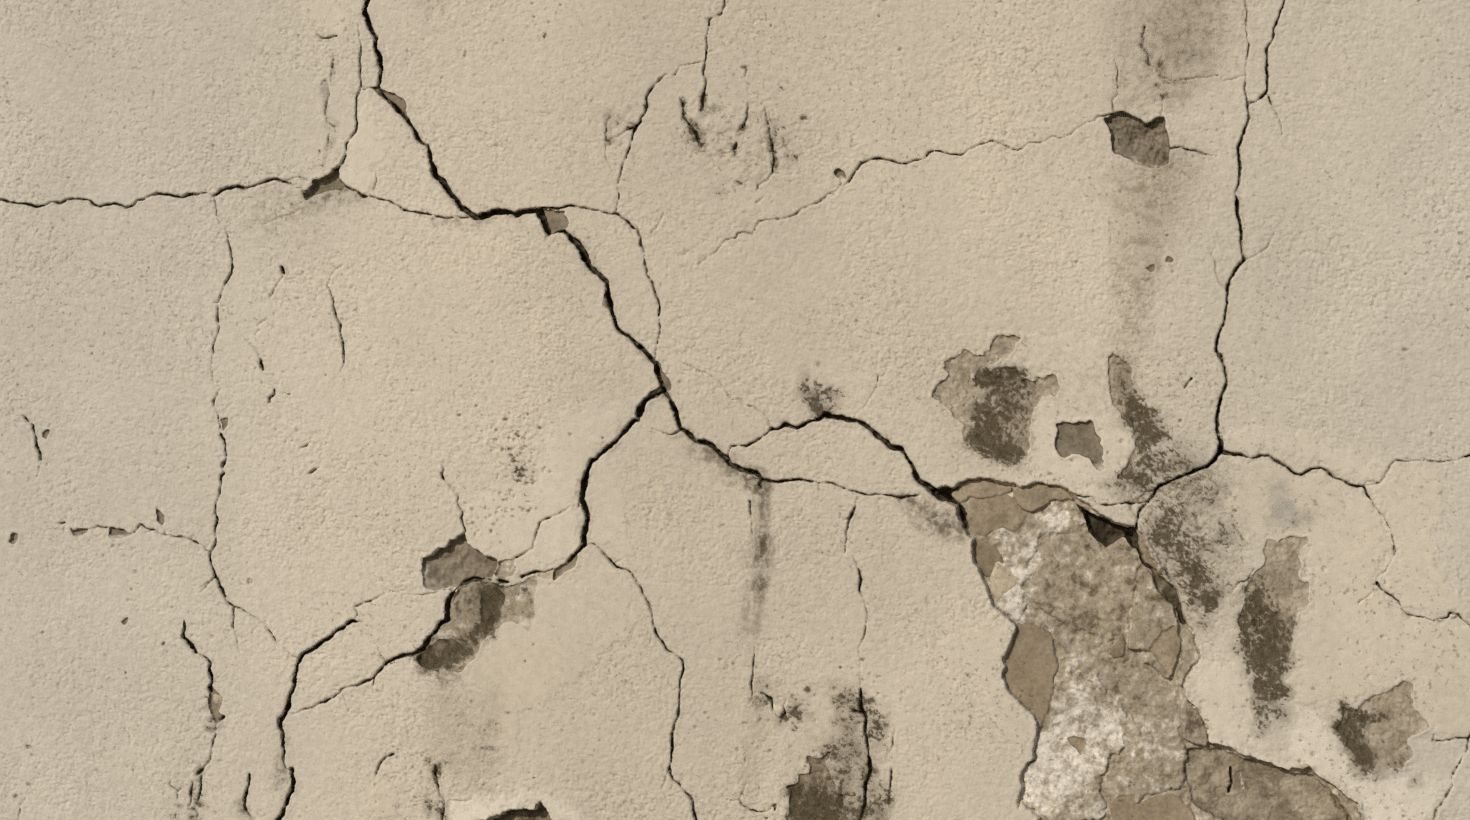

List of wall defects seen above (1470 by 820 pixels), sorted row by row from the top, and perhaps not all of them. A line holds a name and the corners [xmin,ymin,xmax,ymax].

crack [1075,0,1470,625]
crack [0,0,1119,820]
peeling [1055,353,1153,479]
spalling [416,532,578,673]
spalling [488,802,552,820]
water stain [755,682,810,731]
water stain [784,686,894,820]
spalling [920,477,1365,820]
water stain [1105,357,1298,738]
crack [1227,766,1243,793]
water stain [1331,698,1417,787]
crack [1432,735,1470,820]